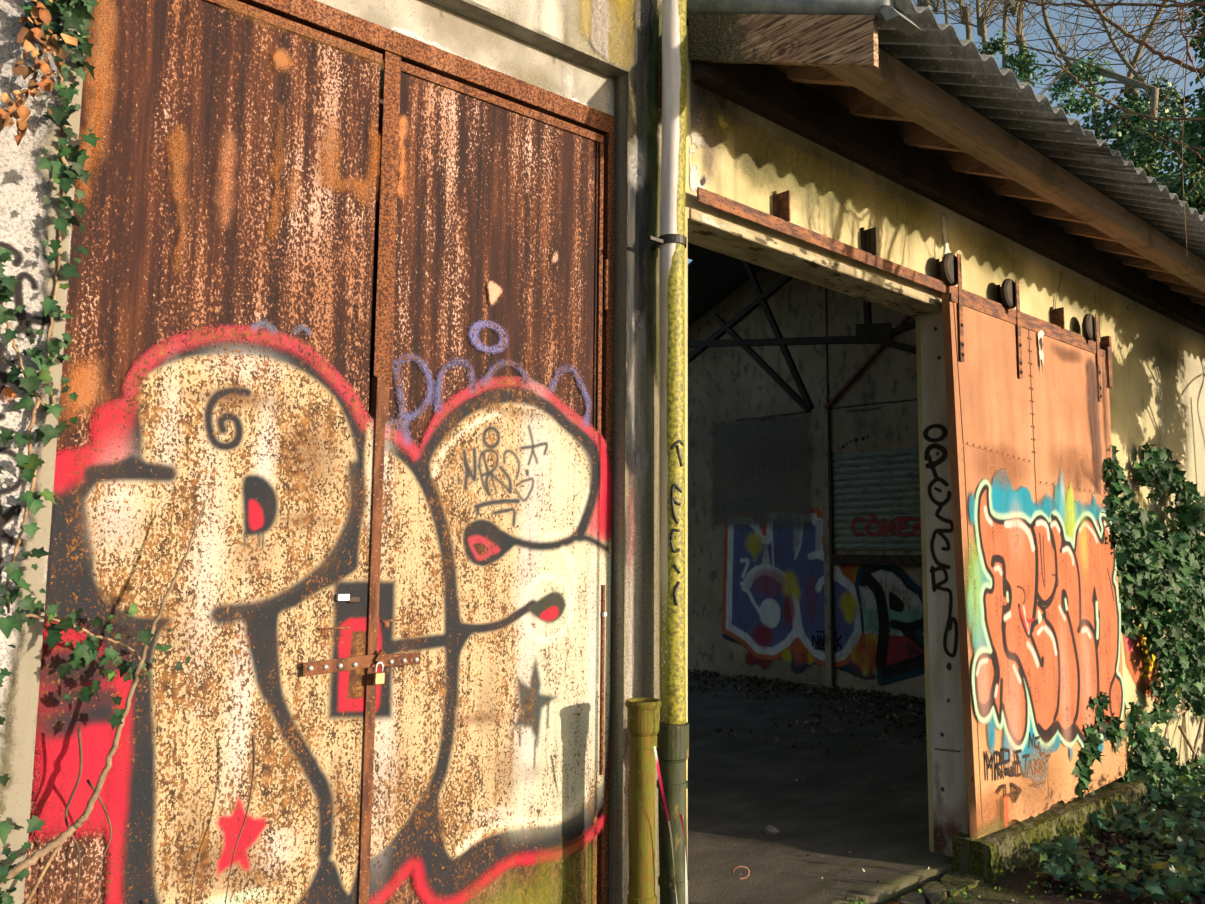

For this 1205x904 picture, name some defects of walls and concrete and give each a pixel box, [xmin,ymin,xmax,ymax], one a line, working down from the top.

rust [80,0,116,198]
rust [273,49,292,69]
rust [170,127,188,255]
rust [220,135,233,222]
rust [321,124,380,203]
rust [397,116,407,197]
rust [488,282,502,304]
rust [1059,349,1109,491]